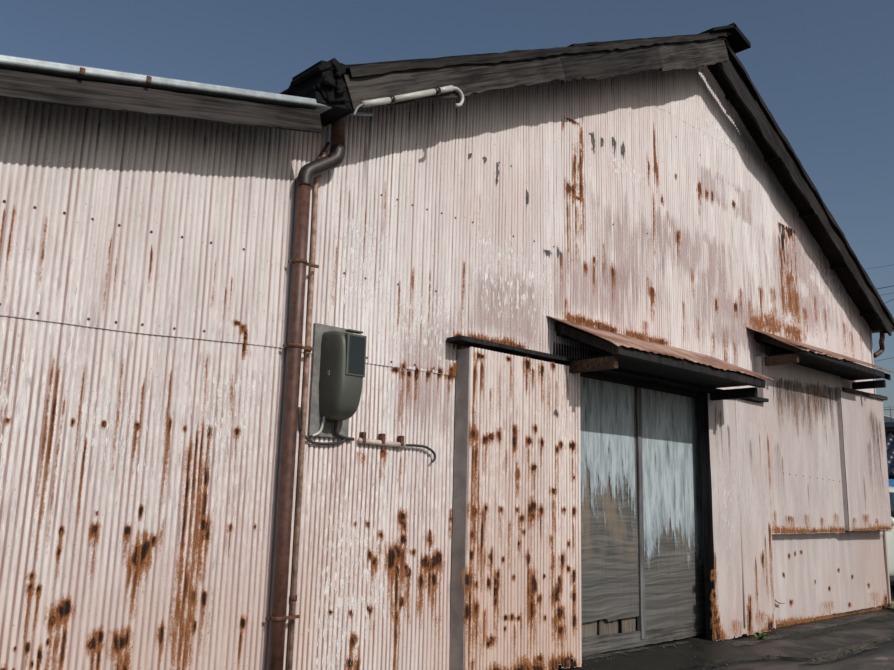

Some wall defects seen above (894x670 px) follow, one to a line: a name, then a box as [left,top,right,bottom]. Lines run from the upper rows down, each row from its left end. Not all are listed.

rust [560,117,616,300]
rust [37,360,87,523]
rust [162,371,172,486]
rust [234,320,248,356]
rust [391,361,456,420]
rust [734,222,827,343]
rust [14,571,73,670]
rust [123,504,164,614]
rust [156,422,212,670]
rust [354,510,451,670]
rust [463,351,578,670]
rust [711,512,892,640]